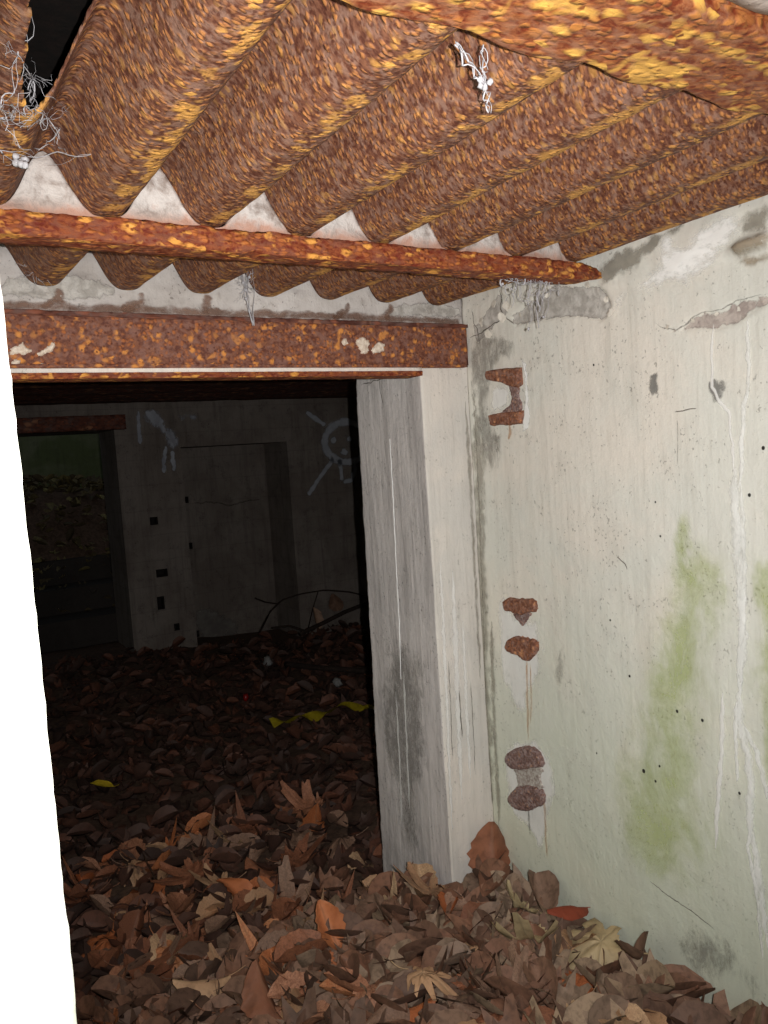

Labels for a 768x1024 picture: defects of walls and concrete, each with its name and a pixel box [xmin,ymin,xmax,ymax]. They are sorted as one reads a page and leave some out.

spalling [387,281,614,344]
spalling [664,297,768,331]
water stain [389,439,410,822]